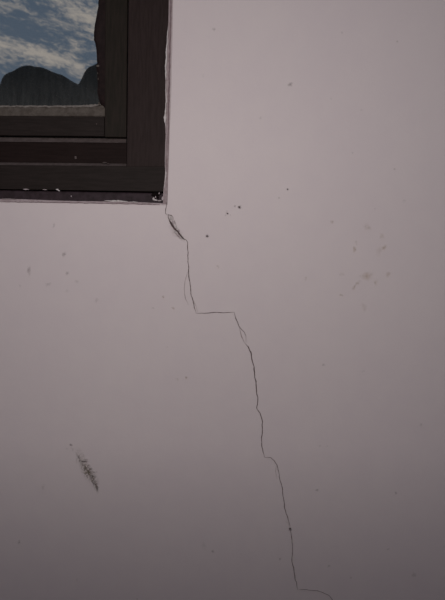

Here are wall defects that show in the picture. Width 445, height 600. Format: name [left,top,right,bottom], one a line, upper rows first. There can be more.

crack [184,239,332,599]